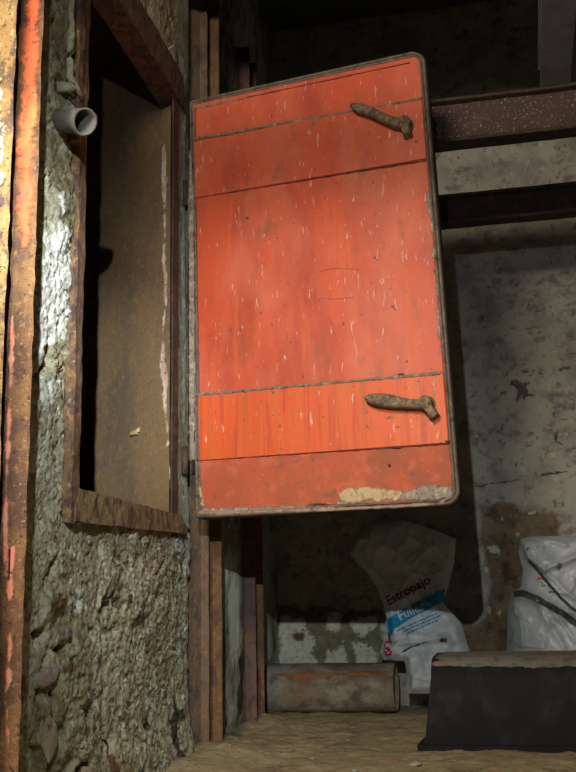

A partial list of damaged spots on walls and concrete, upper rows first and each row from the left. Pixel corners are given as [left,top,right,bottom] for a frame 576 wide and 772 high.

crack [475,471,567,487]
flaking render [462,503,558,651]
peeling [278,604,384,663]